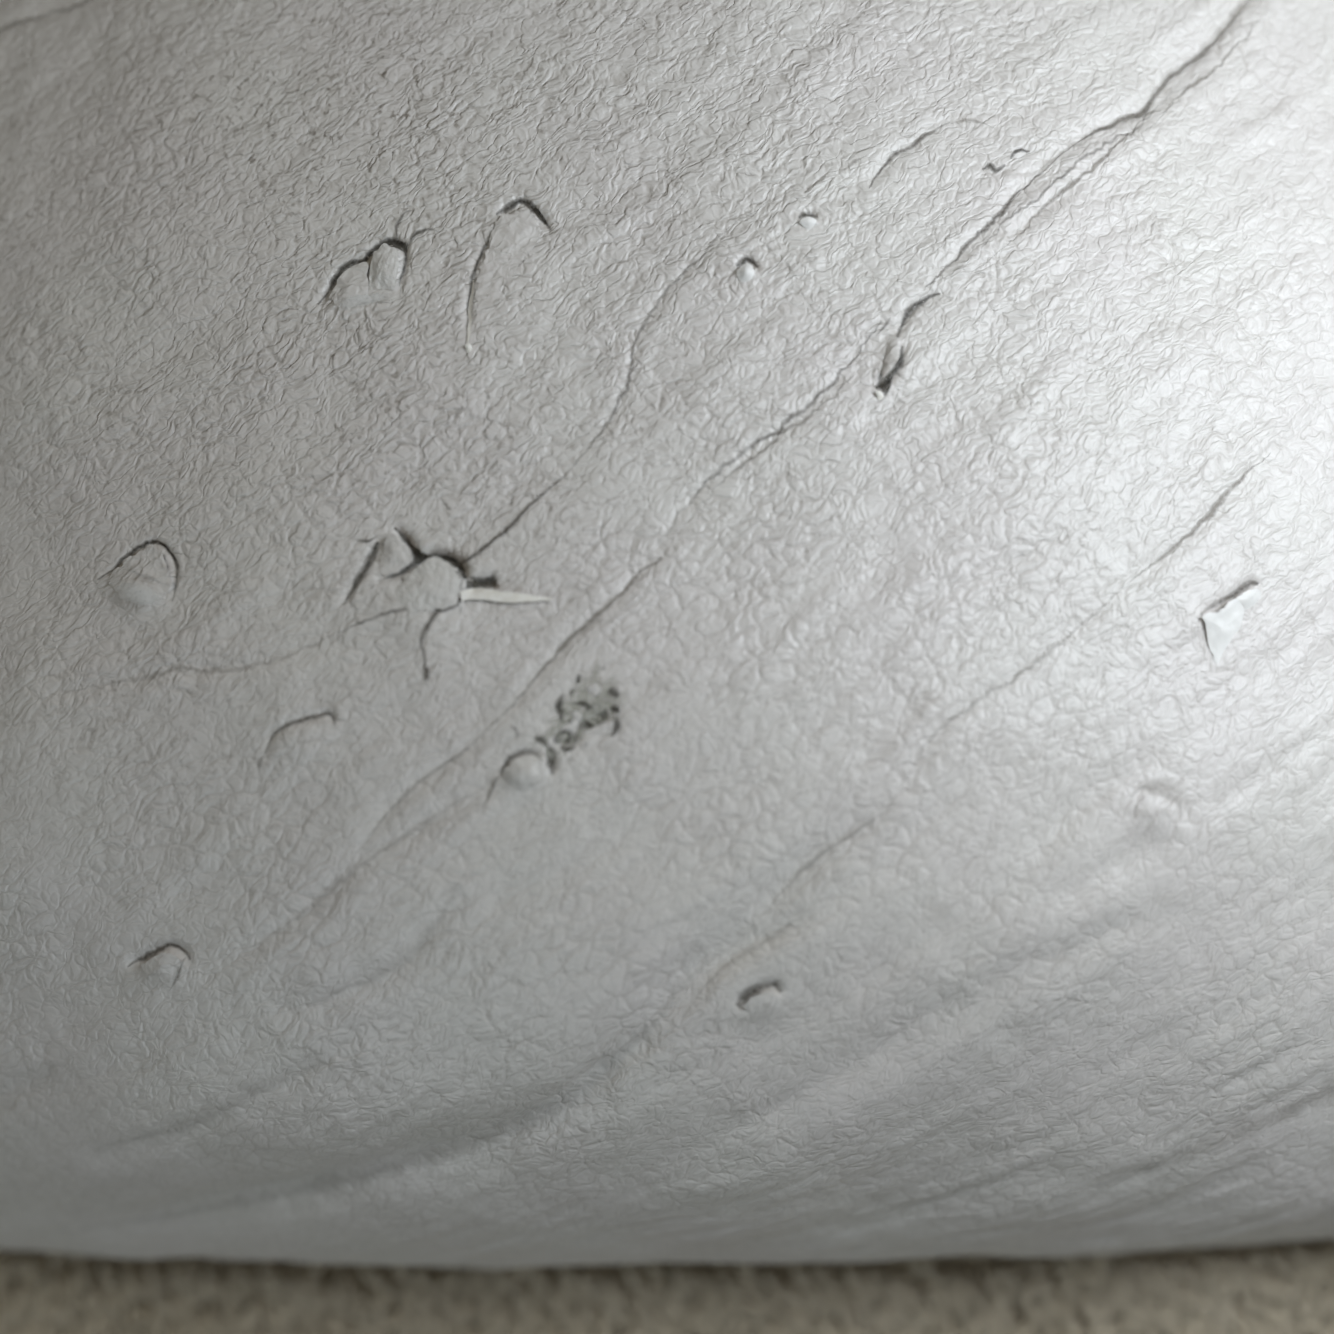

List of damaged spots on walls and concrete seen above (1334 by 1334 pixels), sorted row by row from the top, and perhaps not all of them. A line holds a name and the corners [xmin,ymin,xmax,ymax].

crack [878,133,929,174]
crack [984,149,1025,171]
peeling [573,711,614,734]
crack [487,729,517,800]